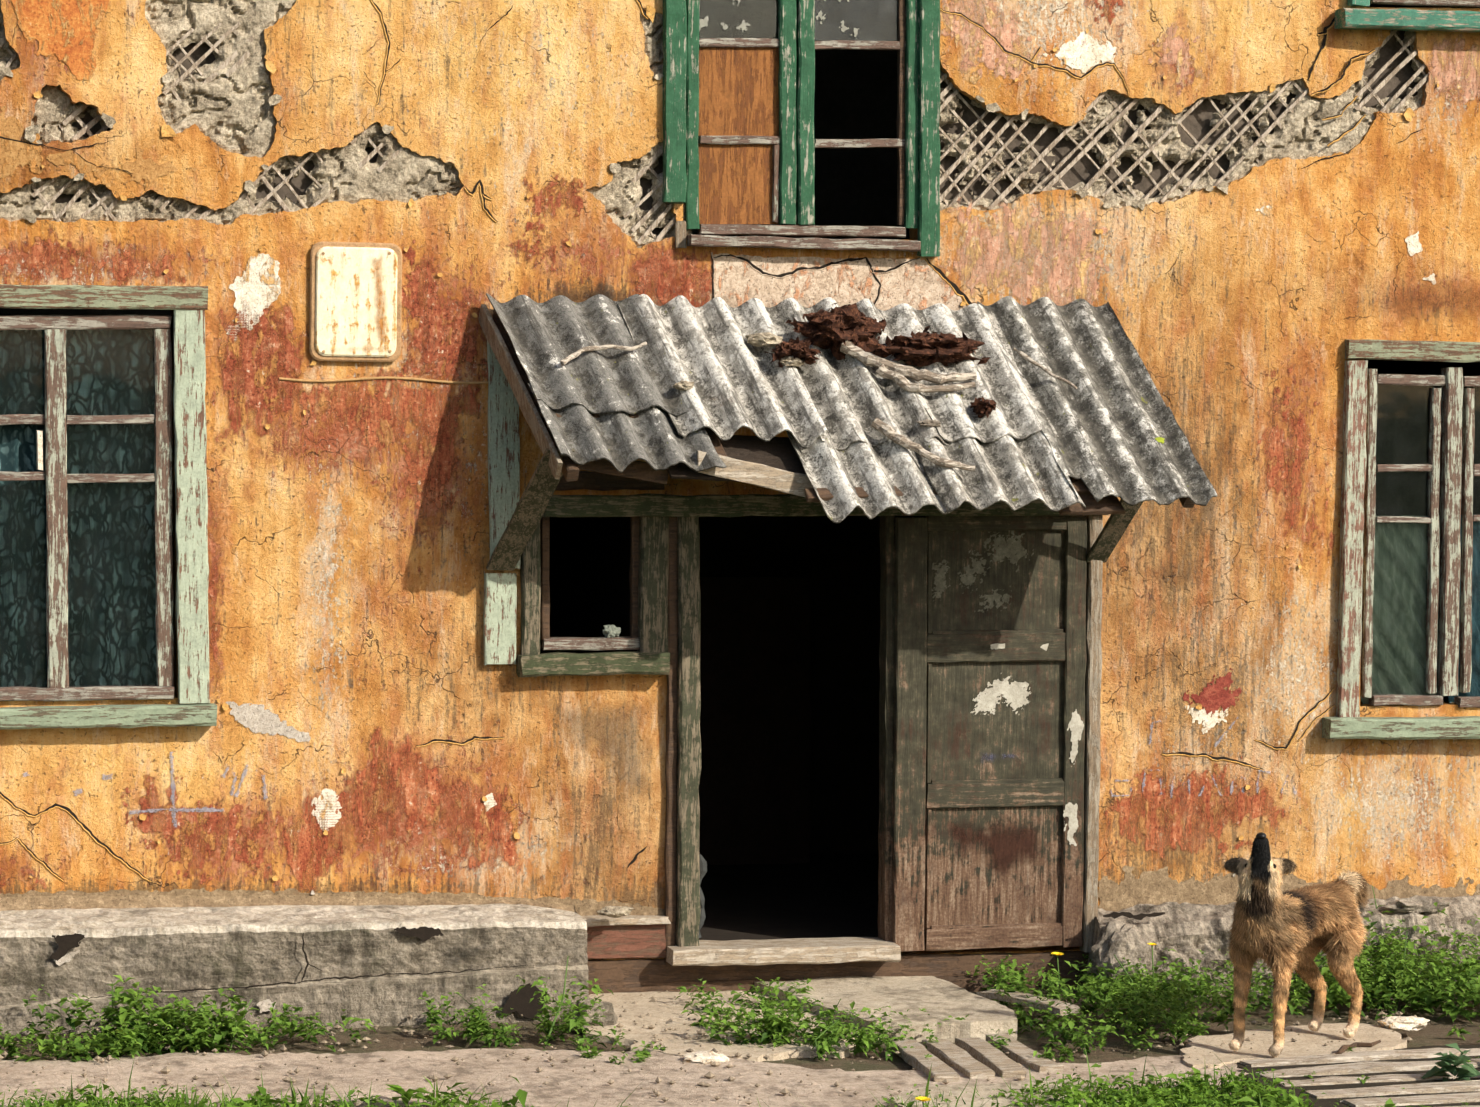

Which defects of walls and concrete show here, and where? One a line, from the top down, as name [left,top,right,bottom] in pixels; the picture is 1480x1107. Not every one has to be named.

crack [370,0,401,105]
flaking render [0,0,463,286]
flaking render [508,0,1480,311]
crack [711,252,972,306]
peeling [207,239,488,509]
peeling [208,558,311,742]
peeling [1181,668,1243,734]
crack [1162,687,1335,771]
crack [0,792,152,882]
peeling [0,727,665,916]
spalling [50,933,85,966]